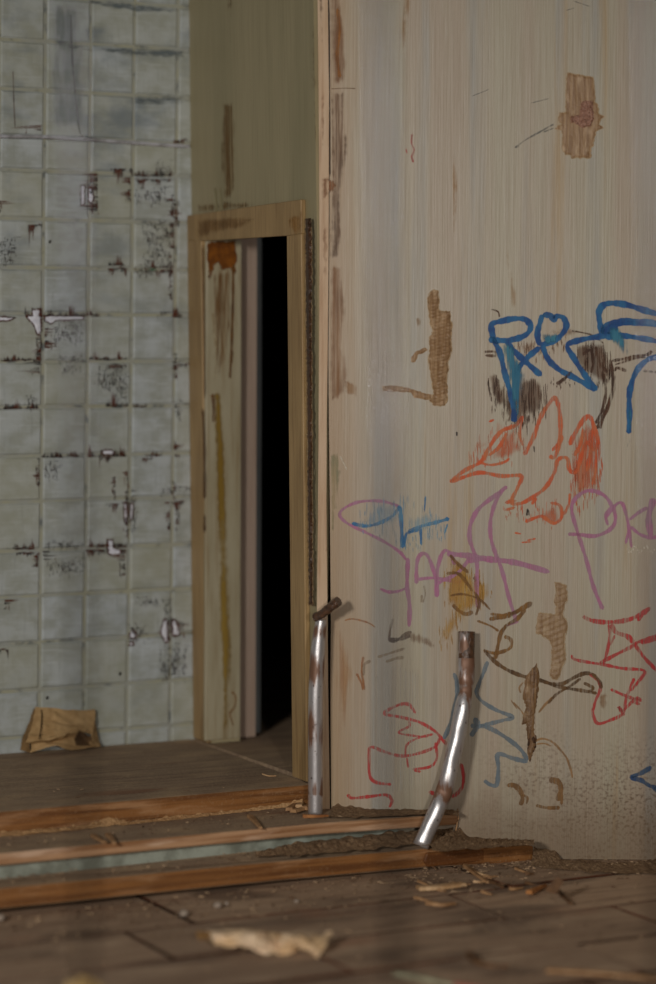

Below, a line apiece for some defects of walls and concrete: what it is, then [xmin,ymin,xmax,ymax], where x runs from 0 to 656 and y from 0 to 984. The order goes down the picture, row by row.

spalling [79,173,99,215]
spalling [0,306,147,408]
corrosion [200,220,238,378]
spalling [392,289,453,407]
spalling [34,446,126,486]
spalling [7,471,137,577]
spalling [137,596,189,681]
spalling [511,582,573,778]